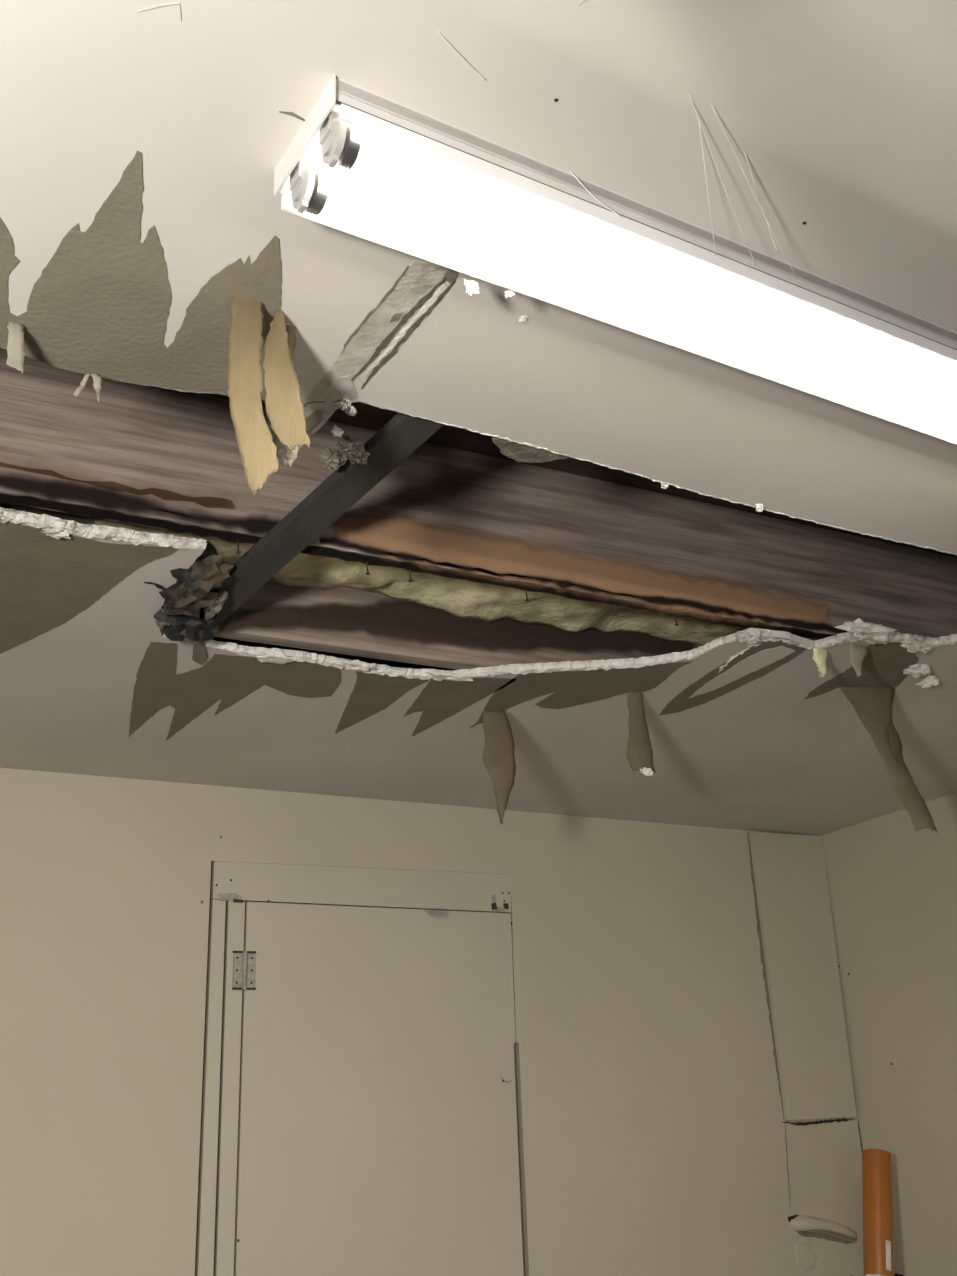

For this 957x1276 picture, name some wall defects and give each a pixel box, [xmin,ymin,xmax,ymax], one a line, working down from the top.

peeling [365,269,458,378]
spalling [0,507,207,550]
spalling [359,401,956,555]
spalling [205,627,864,681]
spalling [894,632,957,646]
crack [747,832,863,1209]